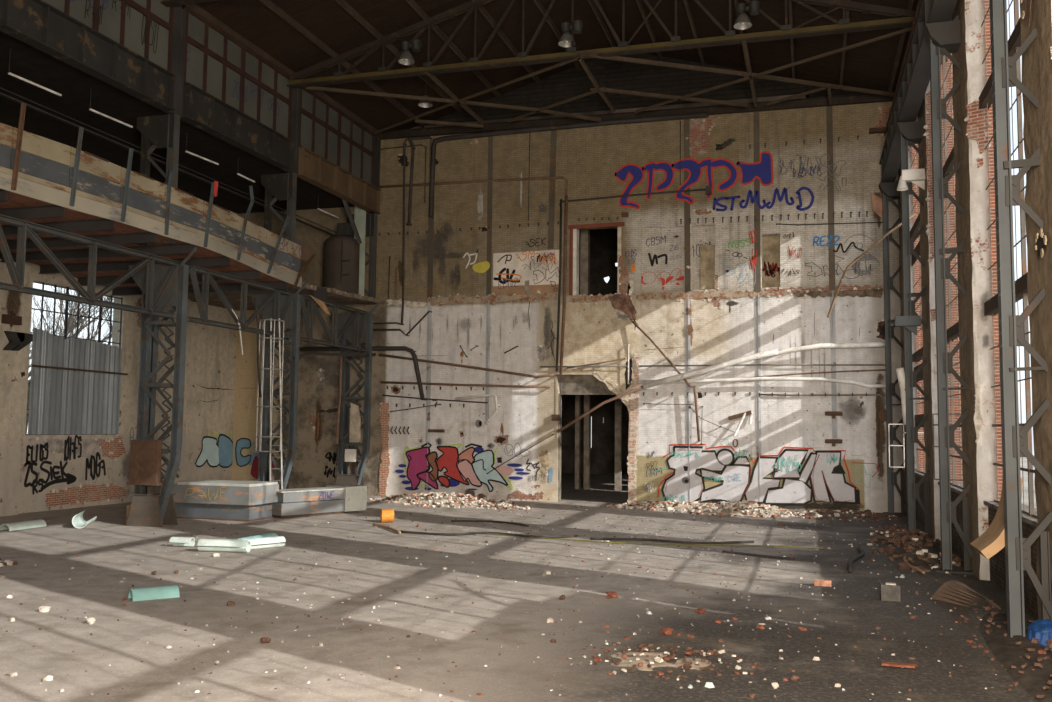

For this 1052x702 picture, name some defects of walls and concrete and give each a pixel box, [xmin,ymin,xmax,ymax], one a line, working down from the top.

spalling [1020,0,1031,28]
spalling [964,98,992,168]
peeling [27,436,127,461]
spalling [377,385,403,496]
spalling [45,481,129,508]